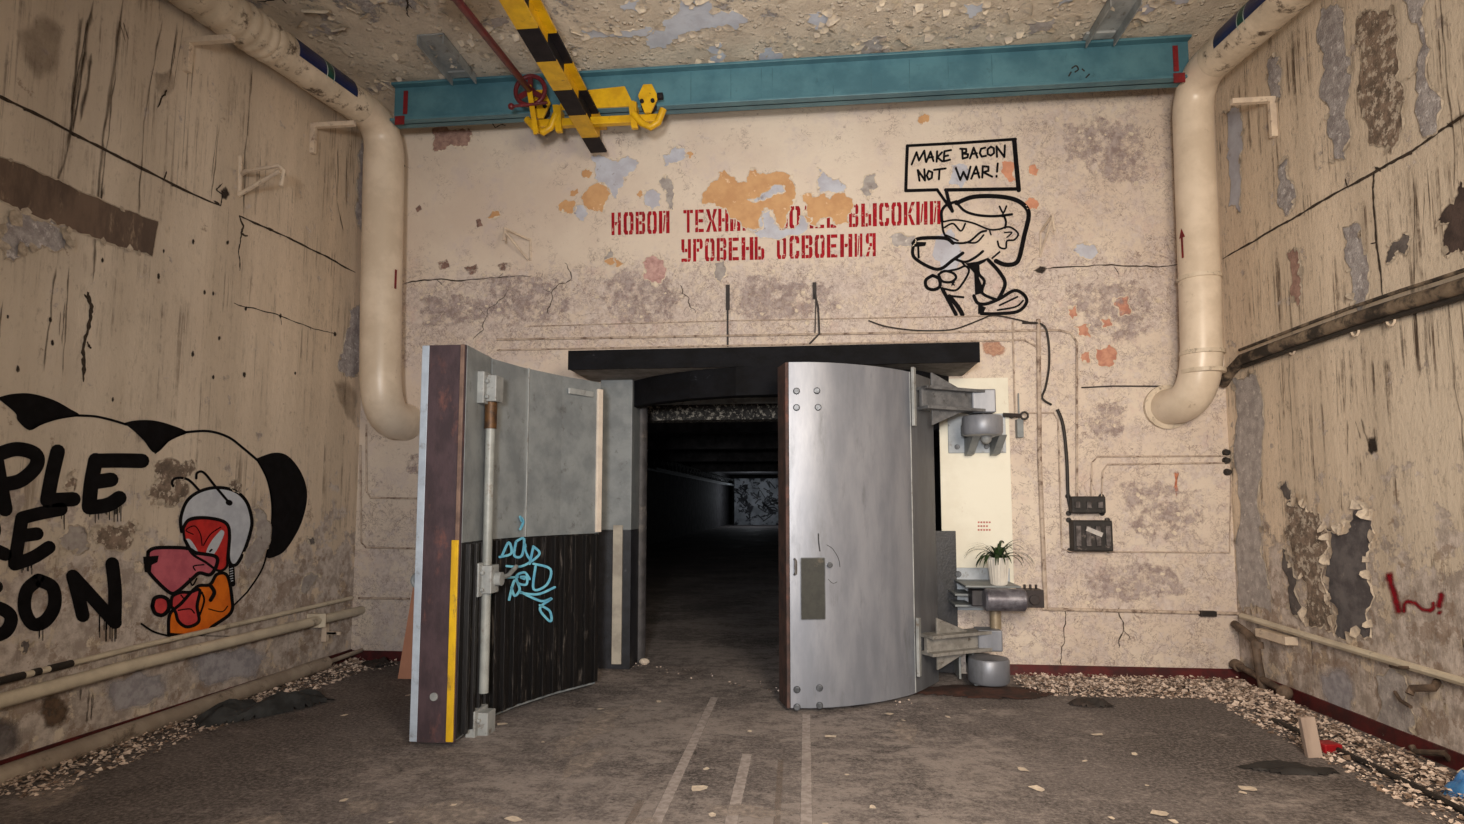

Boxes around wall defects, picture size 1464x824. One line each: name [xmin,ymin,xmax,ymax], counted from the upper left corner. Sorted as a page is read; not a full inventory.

peeling [289,0,540,95]
peeling [560,0,750,71]
peeling [748,0,1115,61]
peeling [1128,0,1195,32]
peeling [1316,0,1444,164]
spalling [0,207,76,263]
peeling [701,167,878,240]
spalling [1230,369,1375,645]